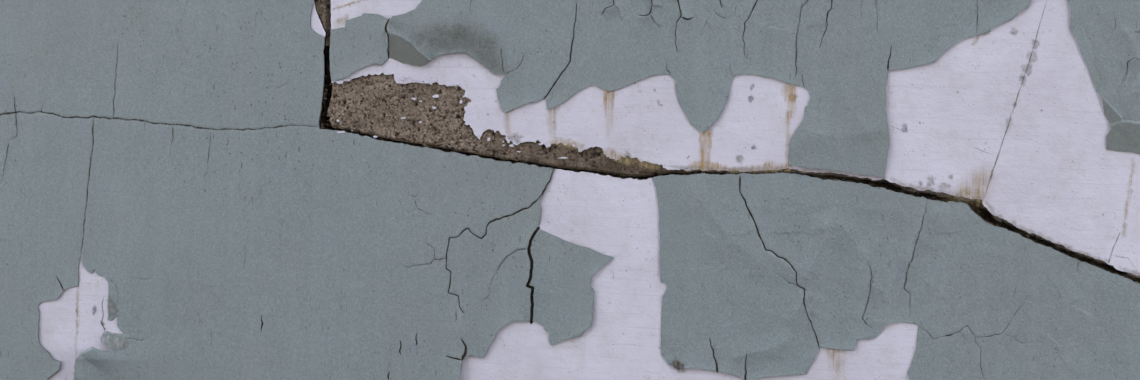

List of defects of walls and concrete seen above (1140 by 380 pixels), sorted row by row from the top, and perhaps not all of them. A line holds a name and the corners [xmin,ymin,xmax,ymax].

crack [383,18,391,59]
crack [543,0,614,99]
crack [640,0,758,74]
crack [795,0,834,73]
crack [0,46,1140,348]
peeling [310,0,1140,380]
peeling [38,258,123,380]
crack [447,339,467,360]
crack [709,339,747,380]
crack [926,311,1017,375]